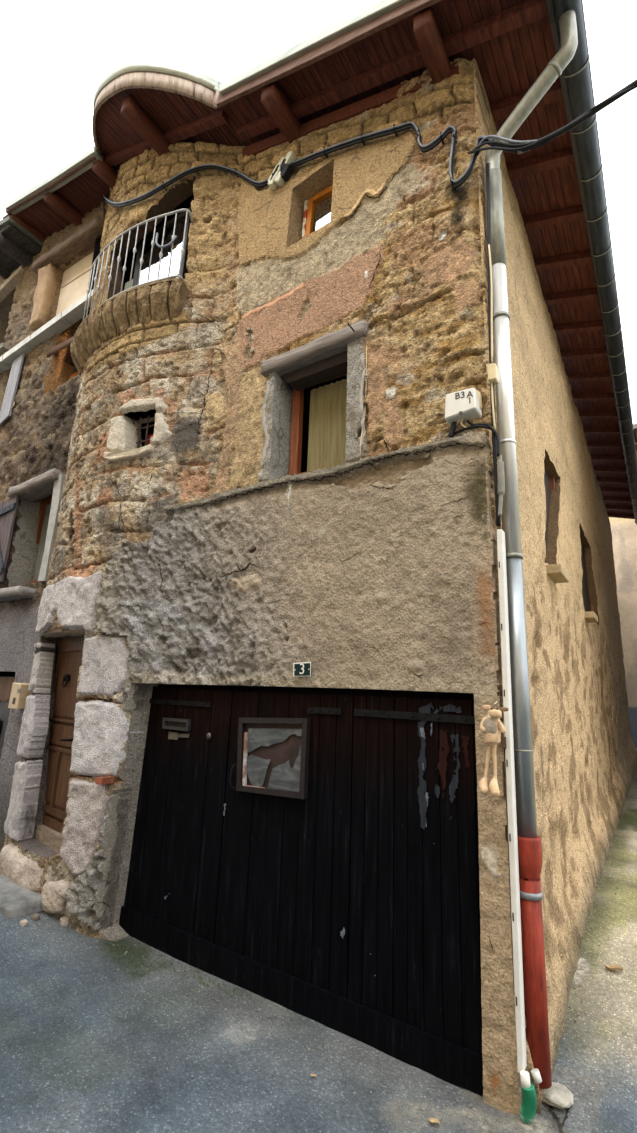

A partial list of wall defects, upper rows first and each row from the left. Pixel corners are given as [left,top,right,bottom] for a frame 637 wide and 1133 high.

peeling [344,182,386,217]
water stain [469,464,487,539]
crack [117,543,257,610]
peeling [417,702,470,829]